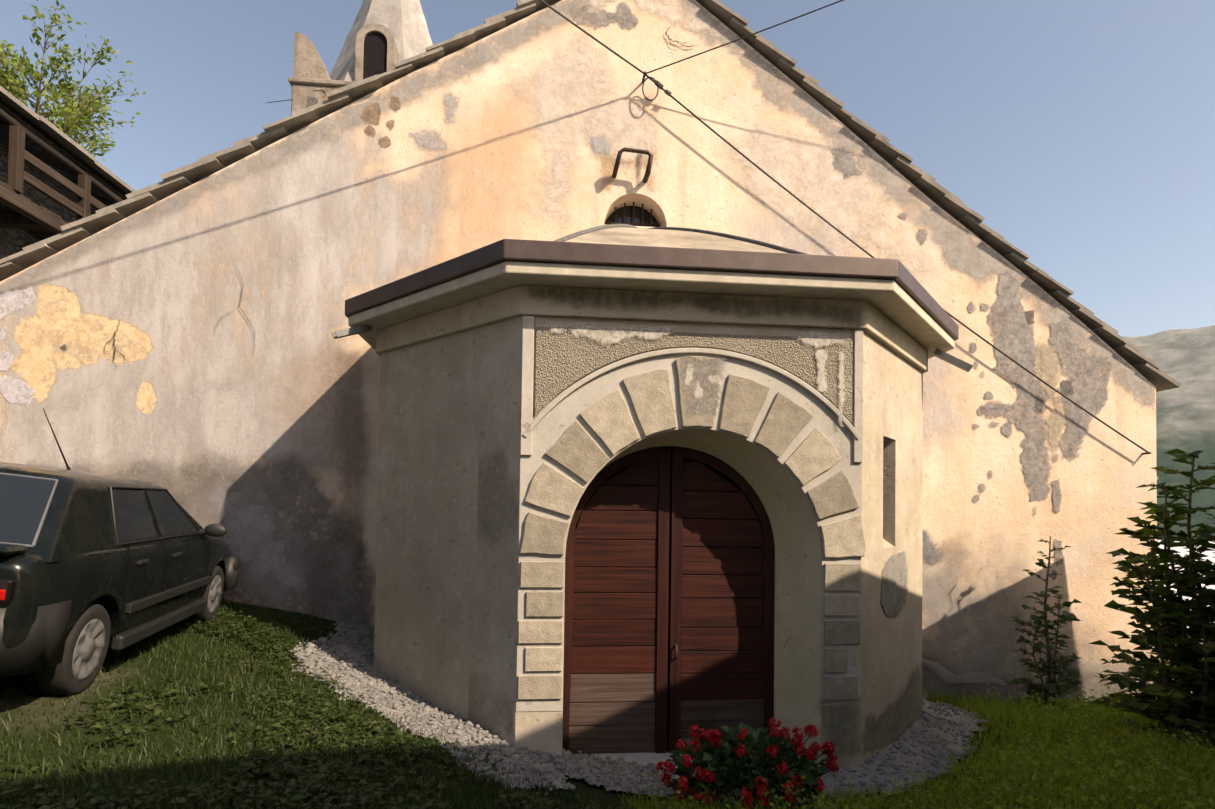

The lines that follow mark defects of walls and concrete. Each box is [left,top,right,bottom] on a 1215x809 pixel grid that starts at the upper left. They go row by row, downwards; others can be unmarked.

spalling [361,96,400,147]
damp [0,0,596,625]
flaking render [0,283,153,407]
crack [104,322,125,367]
flaking render [136,380,158,414]
spalling [680,356,725,416]
flaking render [968,272,1112,515]
flaking render [1052,539,1064,580]
damp [823,531,1142,752]